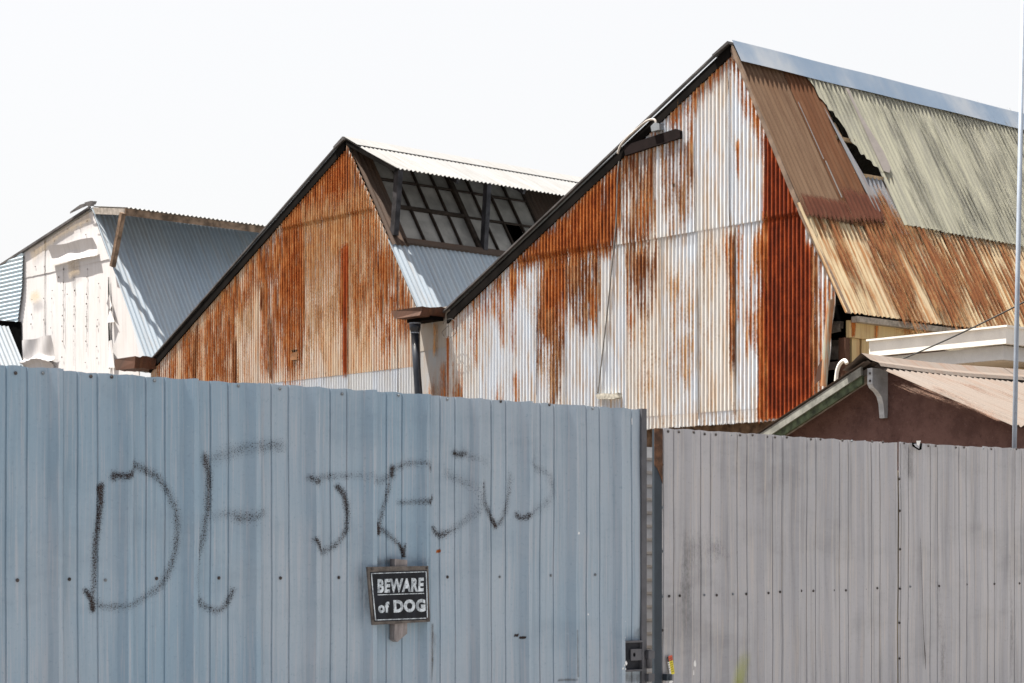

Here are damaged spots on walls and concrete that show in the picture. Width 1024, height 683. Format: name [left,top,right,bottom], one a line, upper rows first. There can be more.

rust [156,149,409,385]
rust [428,57,1024,423]